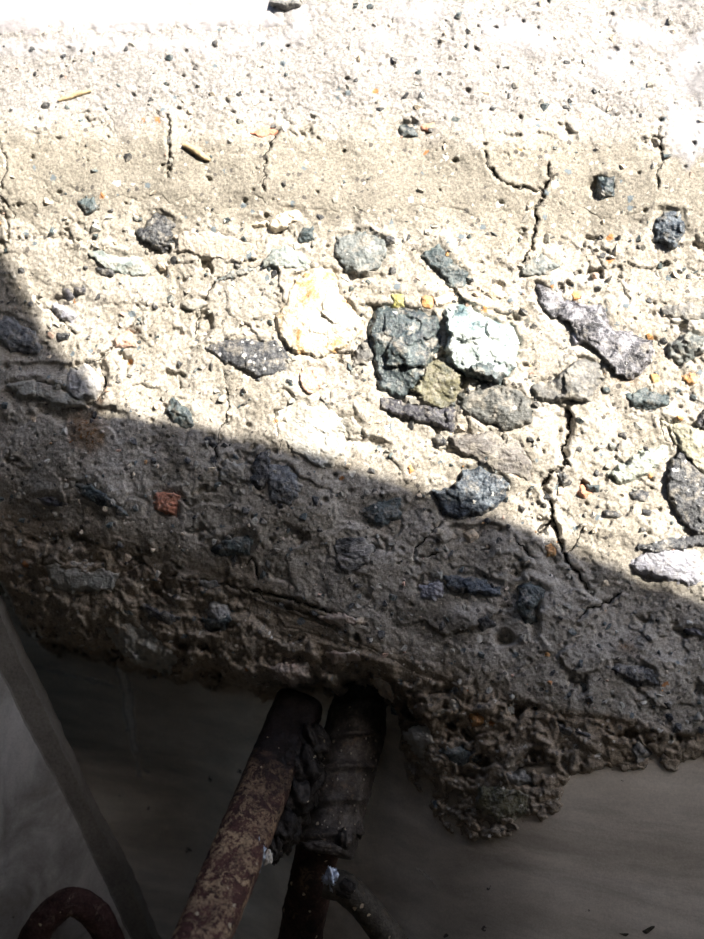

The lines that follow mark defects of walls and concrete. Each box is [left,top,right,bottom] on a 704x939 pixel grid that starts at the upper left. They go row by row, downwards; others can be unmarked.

spalling [346,2,400,89]
spalling [421,0,483,69]
crack [0,147,16,239]
crack [156,112,173,178]
spalling [0,44,686,200]
crack [485,150,558,263]
spalling [0,169,704,738]
crack [514,410,622,618]
spalling [298,673,397,860]
peeling [403,725,481,767]